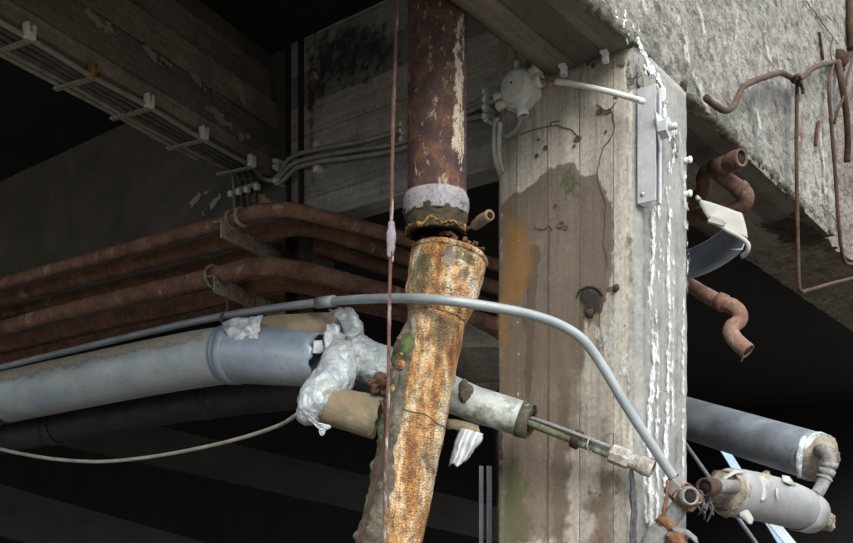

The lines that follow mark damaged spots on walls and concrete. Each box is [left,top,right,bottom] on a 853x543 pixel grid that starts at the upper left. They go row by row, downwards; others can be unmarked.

damp [305,24,399,127]
efflorescence [613,9,668,118]
spalling [686,71,835,237]
rust [761,213,829,247]
damp [499,162,633,430]
damp [647,187,685,478]
damp [498,430,571,543]
damp [591,456,613,543]
efflorescence [643,449,668,526]